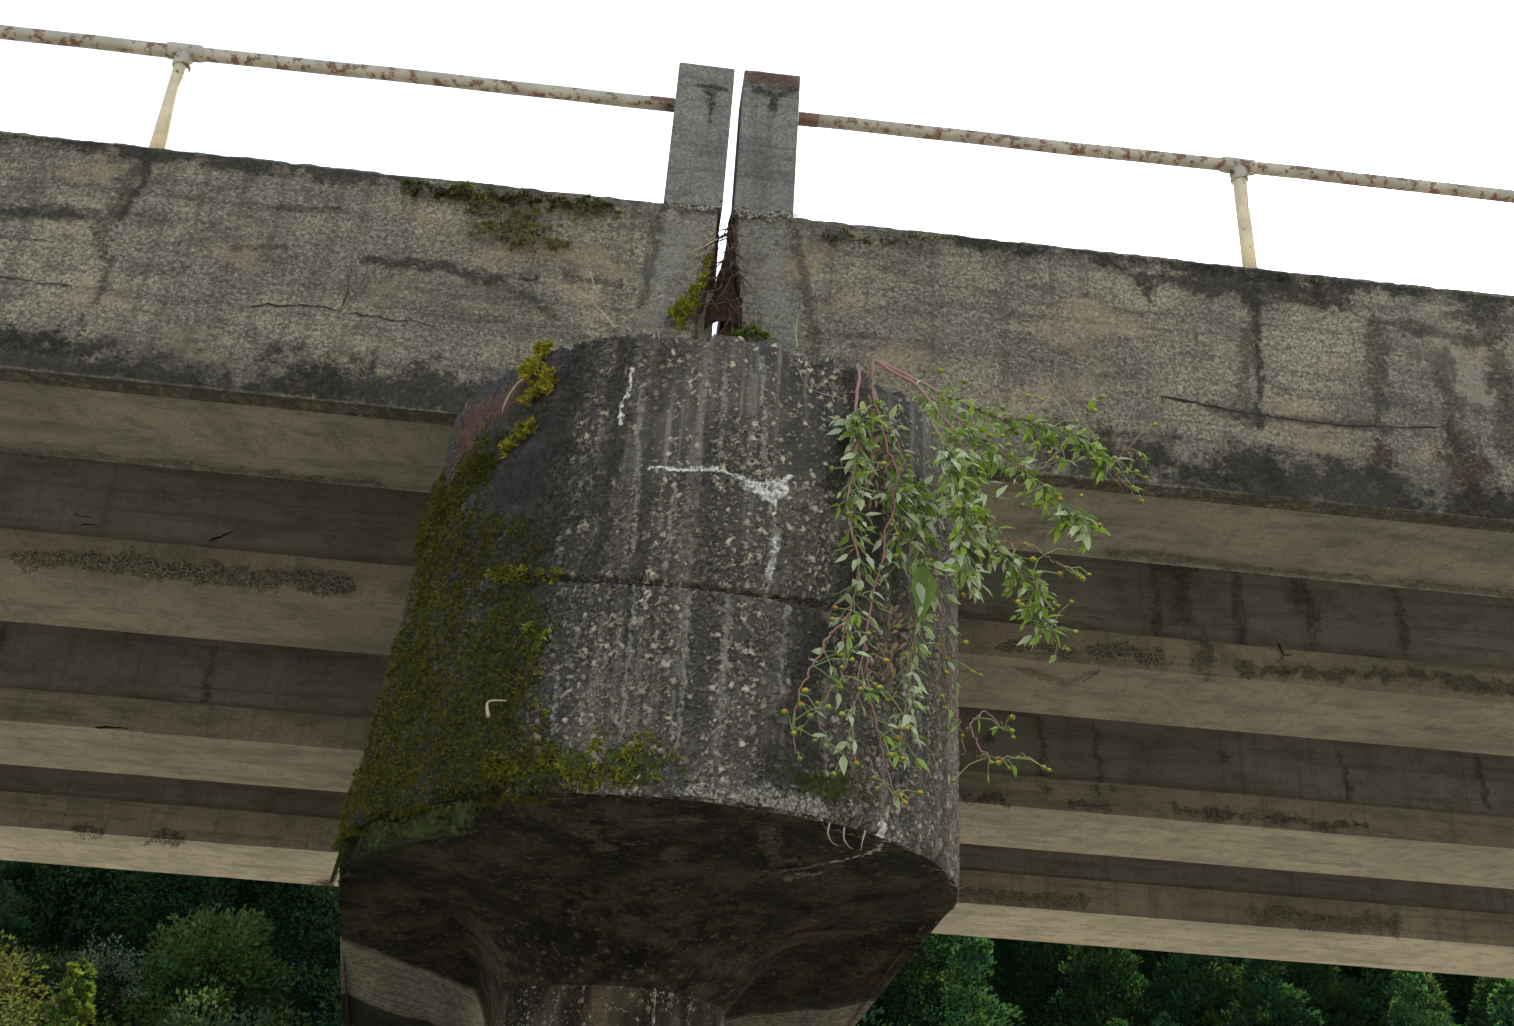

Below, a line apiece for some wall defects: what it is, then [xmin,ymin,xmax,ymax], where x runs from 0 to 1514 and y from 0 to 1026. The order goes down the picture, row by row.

water stain [0,134,423,296]
water stain [945,236,1048,252]
water stain [1030,249,1514,510]
crack [1161,396,1438,428]